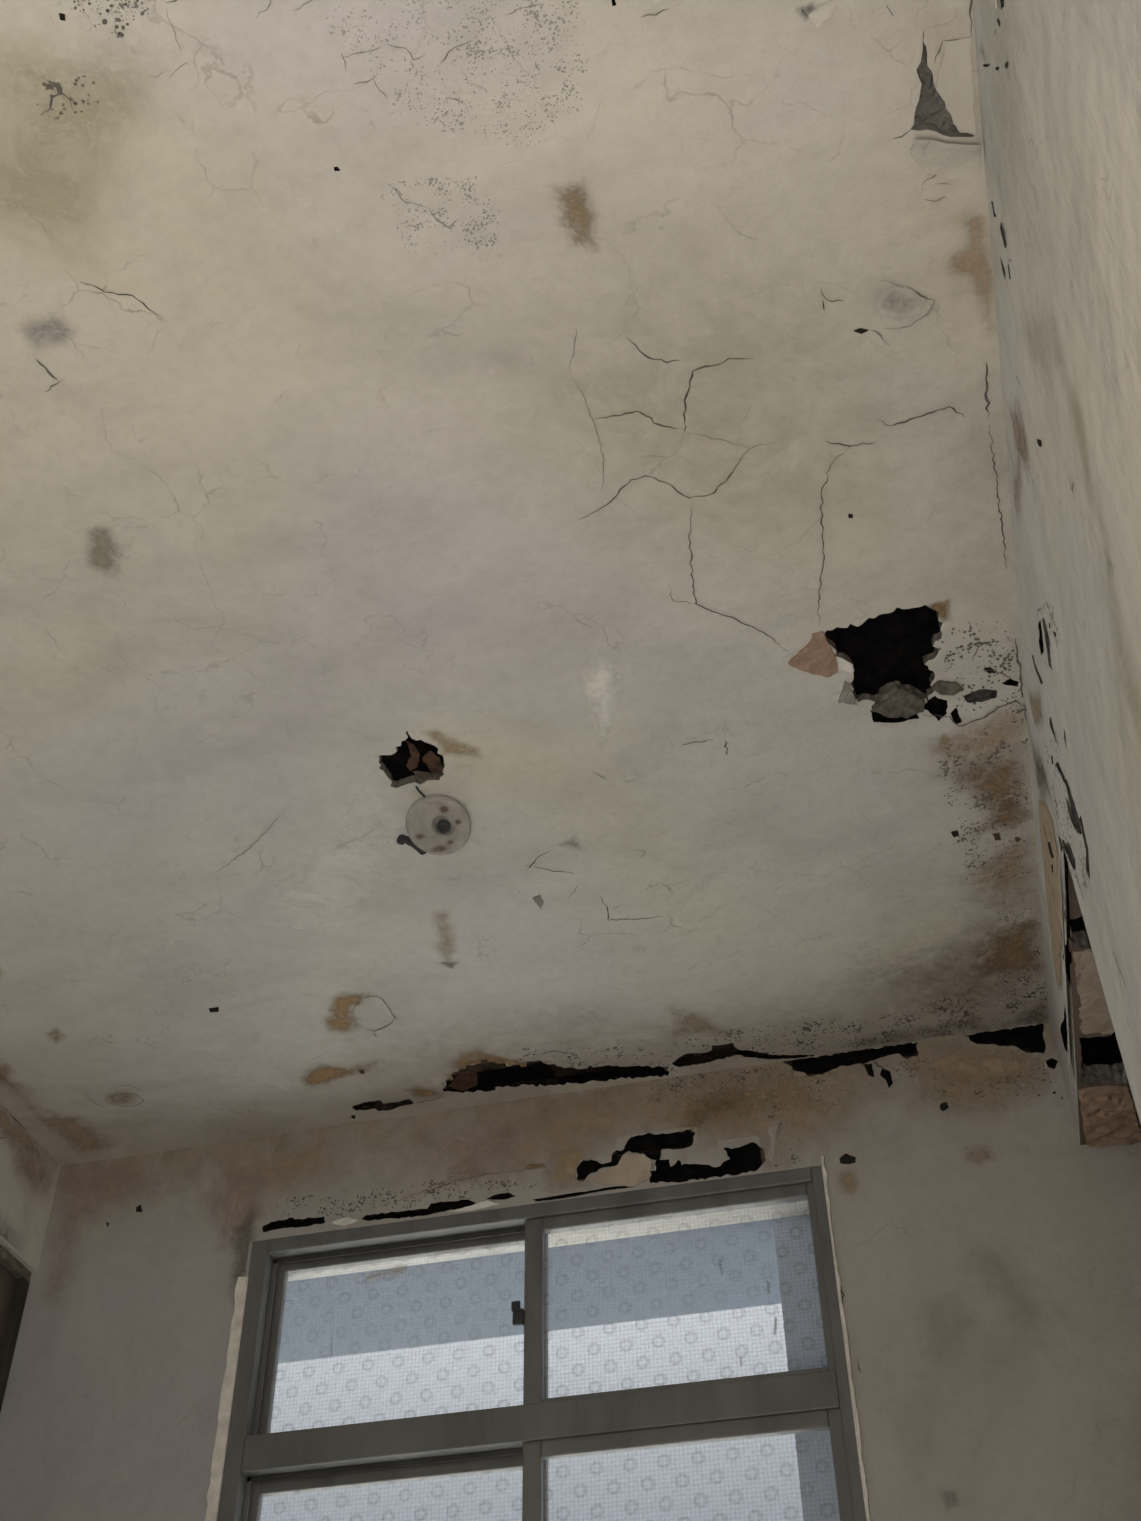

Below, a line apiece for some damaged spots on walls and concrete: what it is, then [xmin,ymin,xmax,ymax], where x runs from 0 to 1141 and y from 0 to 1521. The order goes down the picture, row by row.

crack [967,0,975,37]
spalling [893,31,1009,202]
crack [569,331,783,649]
crack [817,363,1007,623]
spalling [788,601,1027,727]
crack [1015,639,1023,698]
spalling [1032,607,1056,684]
spalling [379,731,475,788]
leakage [517,620,1089,1167]
spalling [351,1042,919,1119]
leakage [277,1176,549,1217]